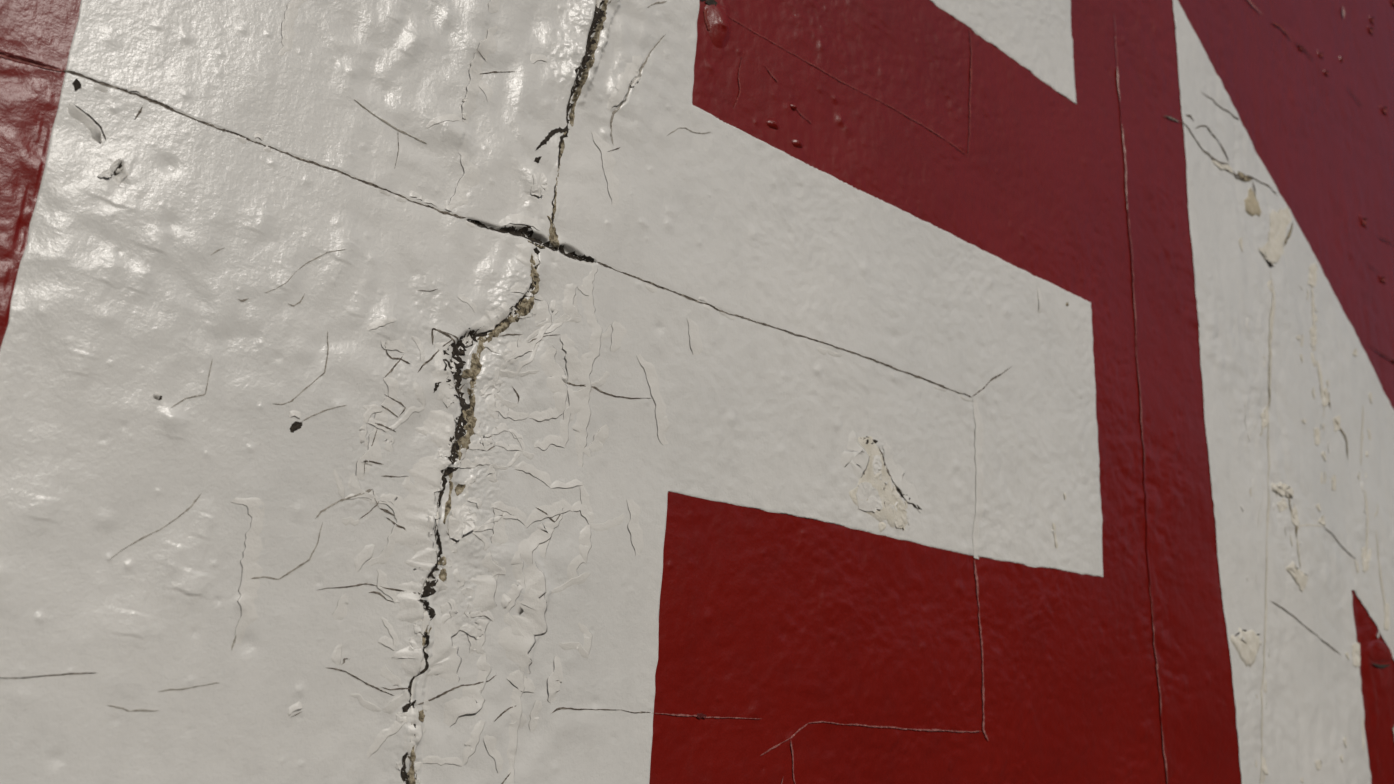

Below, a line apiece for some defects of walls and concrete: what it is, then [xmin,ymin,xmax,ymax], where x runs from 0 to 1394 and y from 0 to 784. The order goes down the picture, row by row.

crack [0,0,1012,784]
peeling [419,282,644,784]
peeling [1230,186,1326,784]
peeling [1345,643,1361,667]